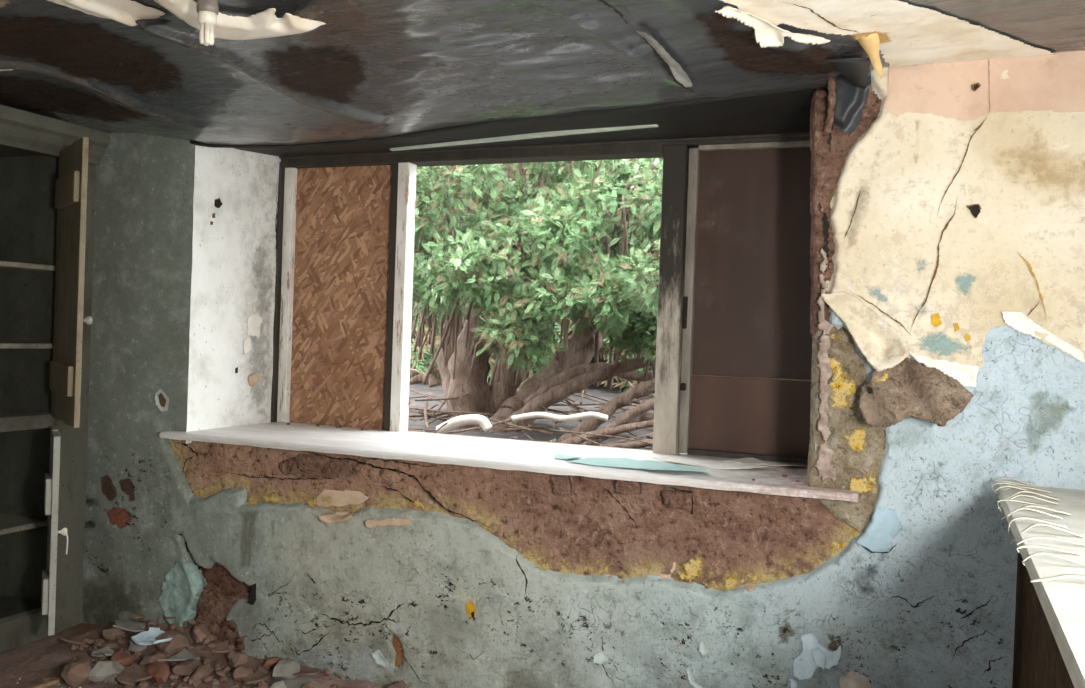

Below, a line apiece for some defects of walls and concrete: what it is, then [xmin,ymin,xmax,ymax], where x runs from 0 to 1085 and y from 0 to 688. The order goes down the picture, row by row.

damp [0,16,200,127]
crack [858,63,990,333]
flaking render [169,0,1085,612]
peeling [155,389,169,412]
spalling [84,453,170,573]
flaking render [158,533,257,652]
spalling [258,568,624,685]
peeling [653,606,885,688]
spalling [931,585,981,633]